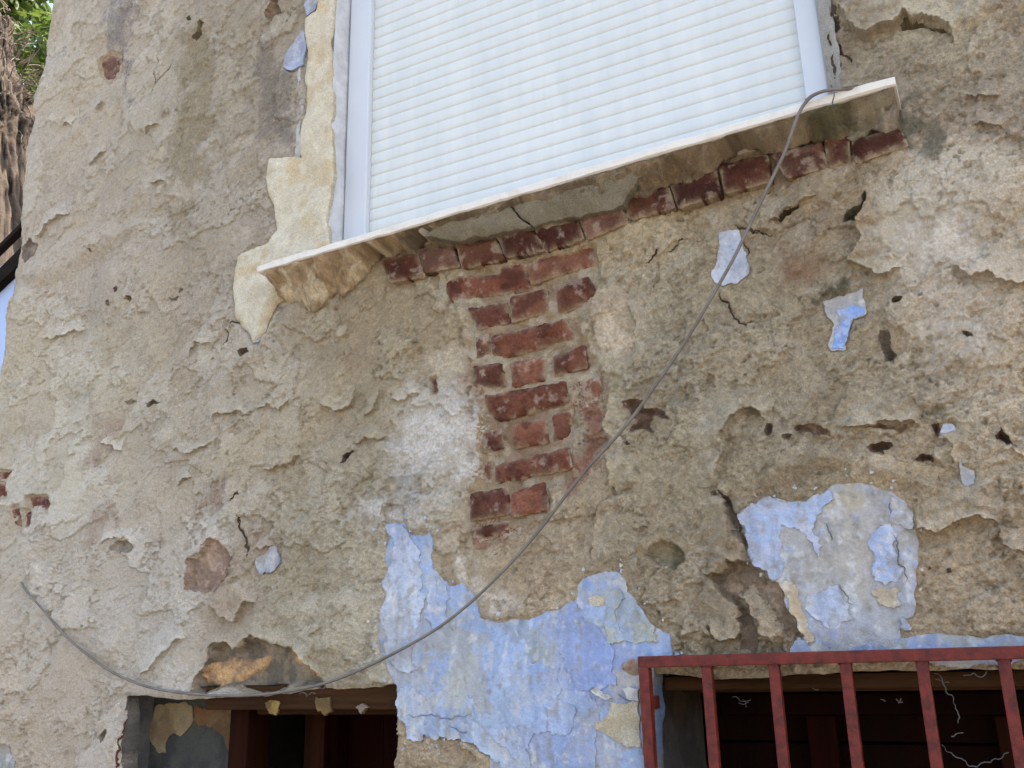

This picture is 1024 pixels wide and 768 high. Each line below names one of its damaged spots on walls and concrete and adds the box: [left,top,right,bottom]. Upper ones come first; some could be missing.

crack [736,225,770,255]
crack [719,293,753,326]
peeling [366,130,1024,768]
flaking render [0,468,51,532]
crack [229,492,250,556]
peeling [138,617,186,676]
flaking render [149,524,334,753]